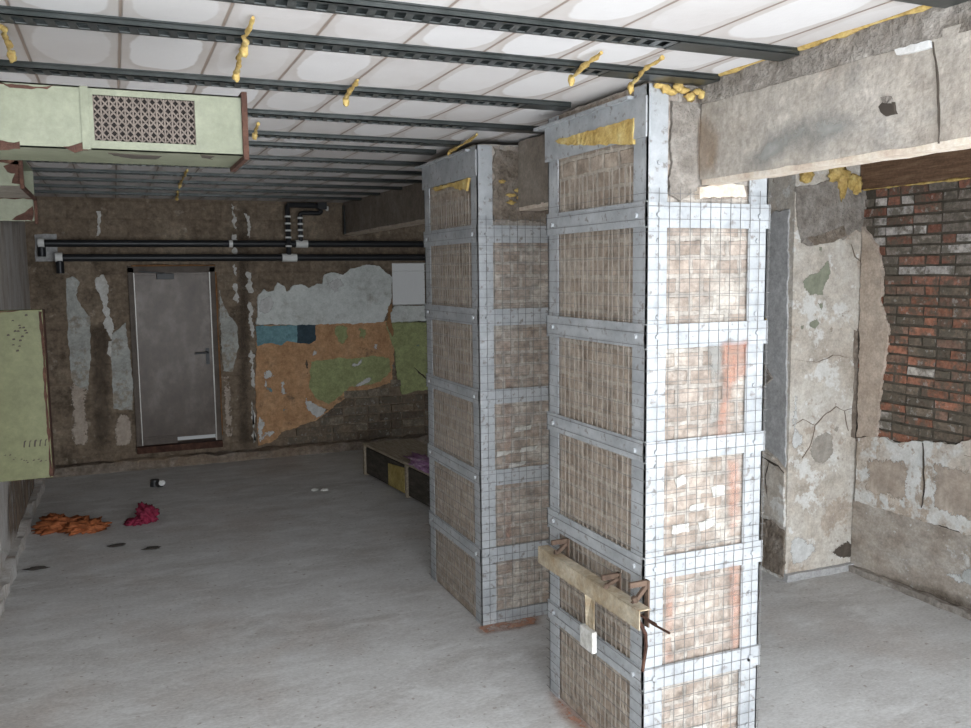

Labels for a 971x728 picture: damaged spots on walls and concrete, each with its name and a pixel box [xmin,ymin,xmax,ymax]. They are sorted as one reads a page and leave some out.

peeling [66,276,91,445]
peeling [111,323,133,446]
peeling [255,265,428,446]
flaking render [792,178,971,535]
flaking render [833,541,851,558]
crack [919,443,927,508]